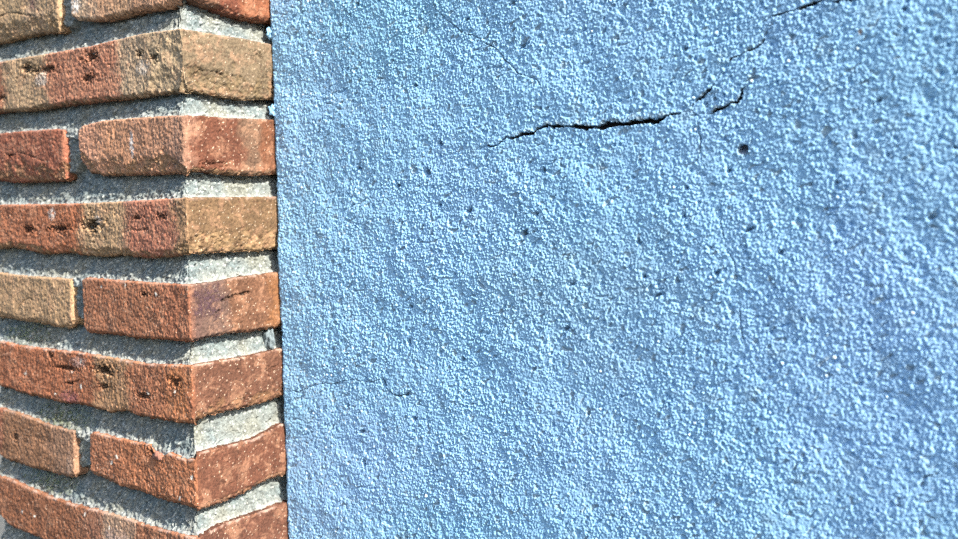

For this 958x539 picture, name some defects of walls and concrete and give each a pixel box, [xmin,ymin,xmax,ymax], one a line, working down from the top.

crack [775,0,853,16]
crack [489,89,743,147]